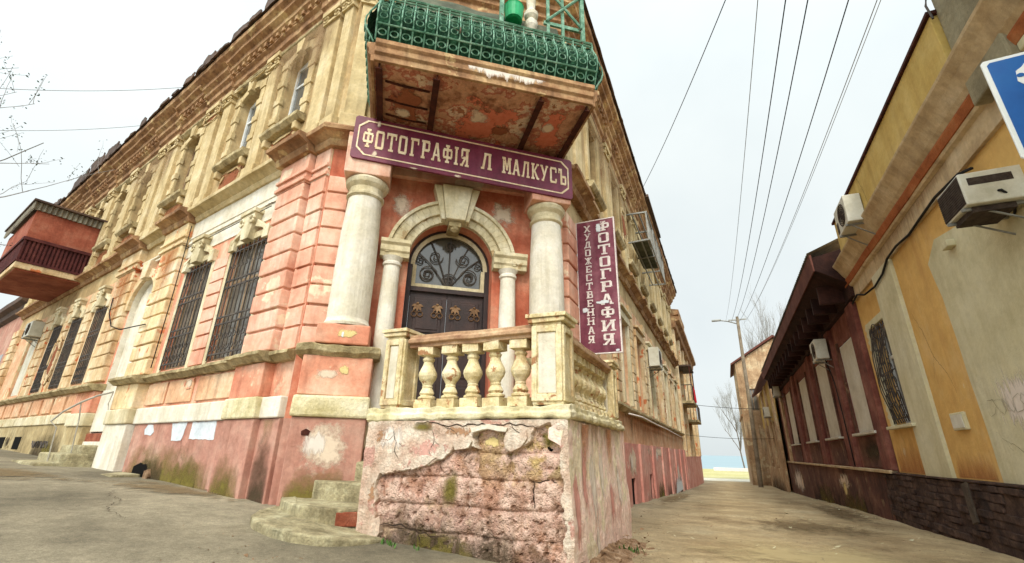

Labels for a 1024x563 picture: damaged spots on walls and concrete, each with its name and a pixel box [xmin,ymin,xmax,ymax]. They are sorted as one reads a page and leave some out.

water stain [469,65,543,84]
spalling [390,88,423,125]
spalling [451,95,521,146]
spalling [533,112,568,149]
peeling [301,424,346,467]
crack [383,421,543,458]
water stain [247,455,264,503]
spalling [368,423,623,563]